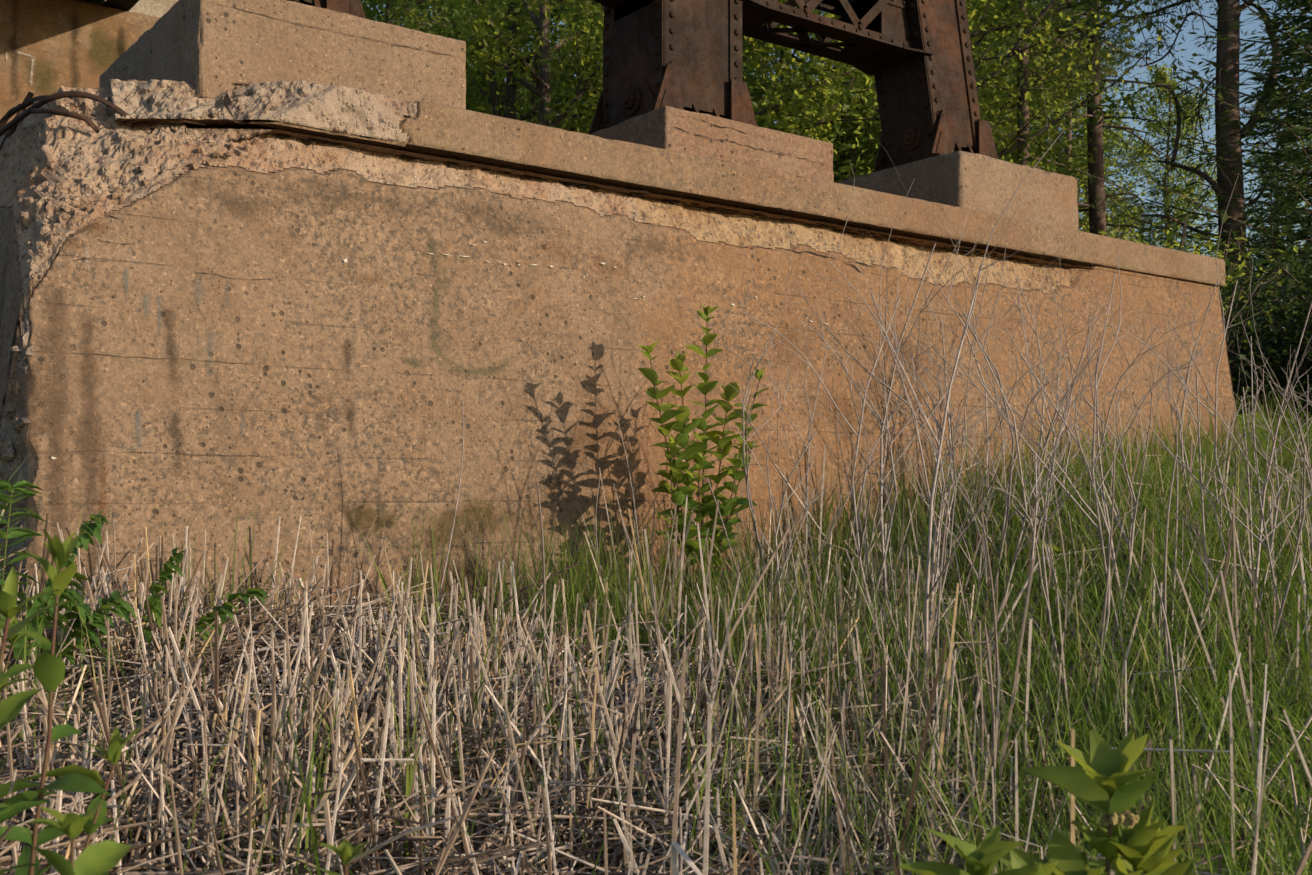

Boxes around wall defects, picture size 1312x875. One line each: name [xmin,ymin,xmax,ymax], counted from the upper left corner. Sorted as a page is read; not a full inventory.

spalling [0,79,1089,620]